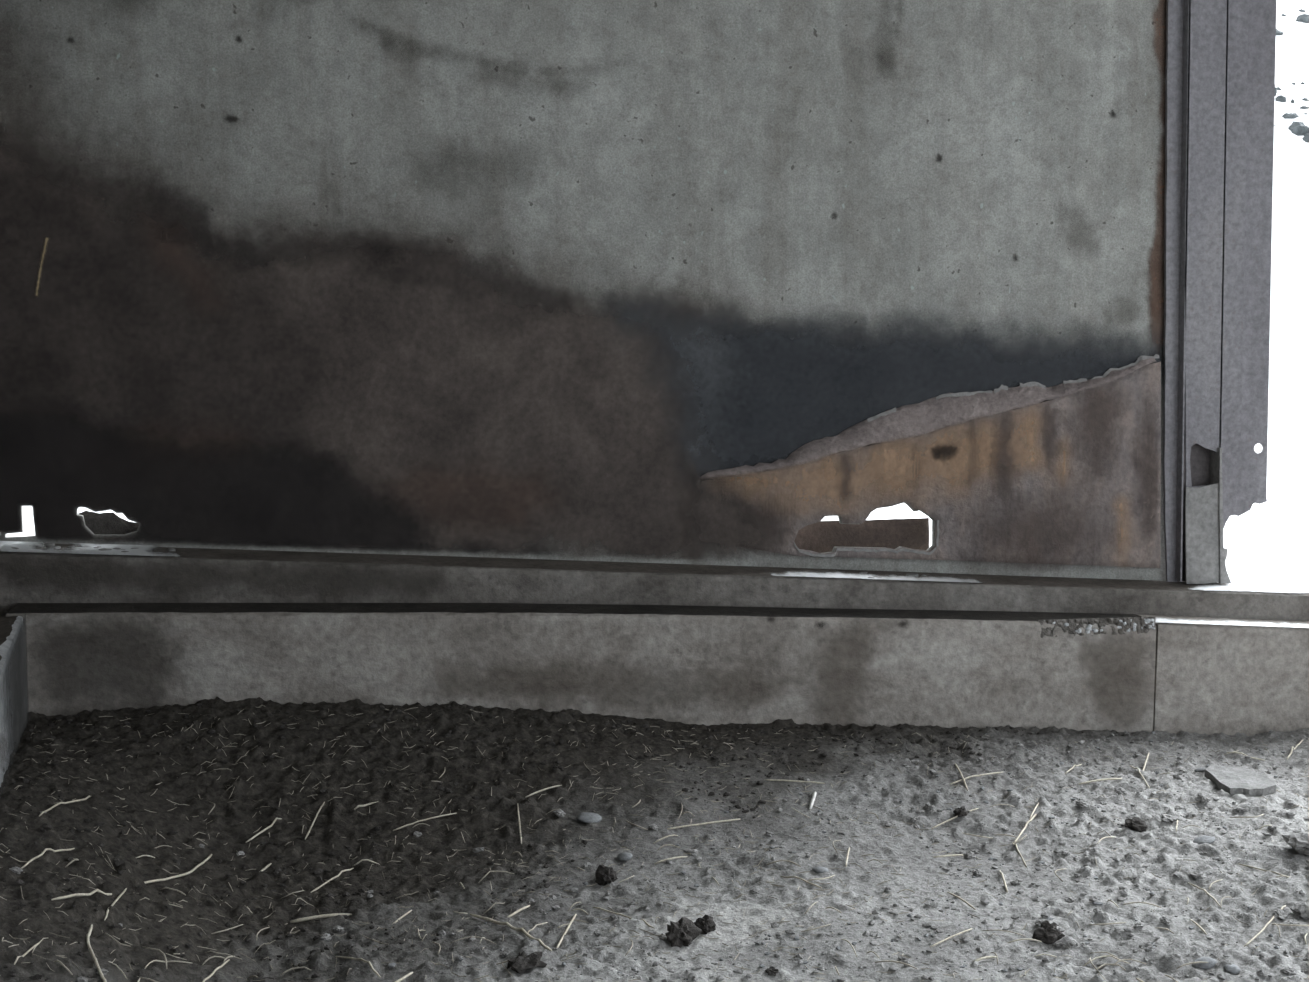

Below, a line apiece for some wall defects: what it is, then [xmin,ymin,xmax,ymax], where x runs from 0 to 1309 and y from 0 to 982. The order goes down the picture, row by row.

damp [618,303,1164,474]
peeling [683,354,1161,568]
damp [0,541,437,589]